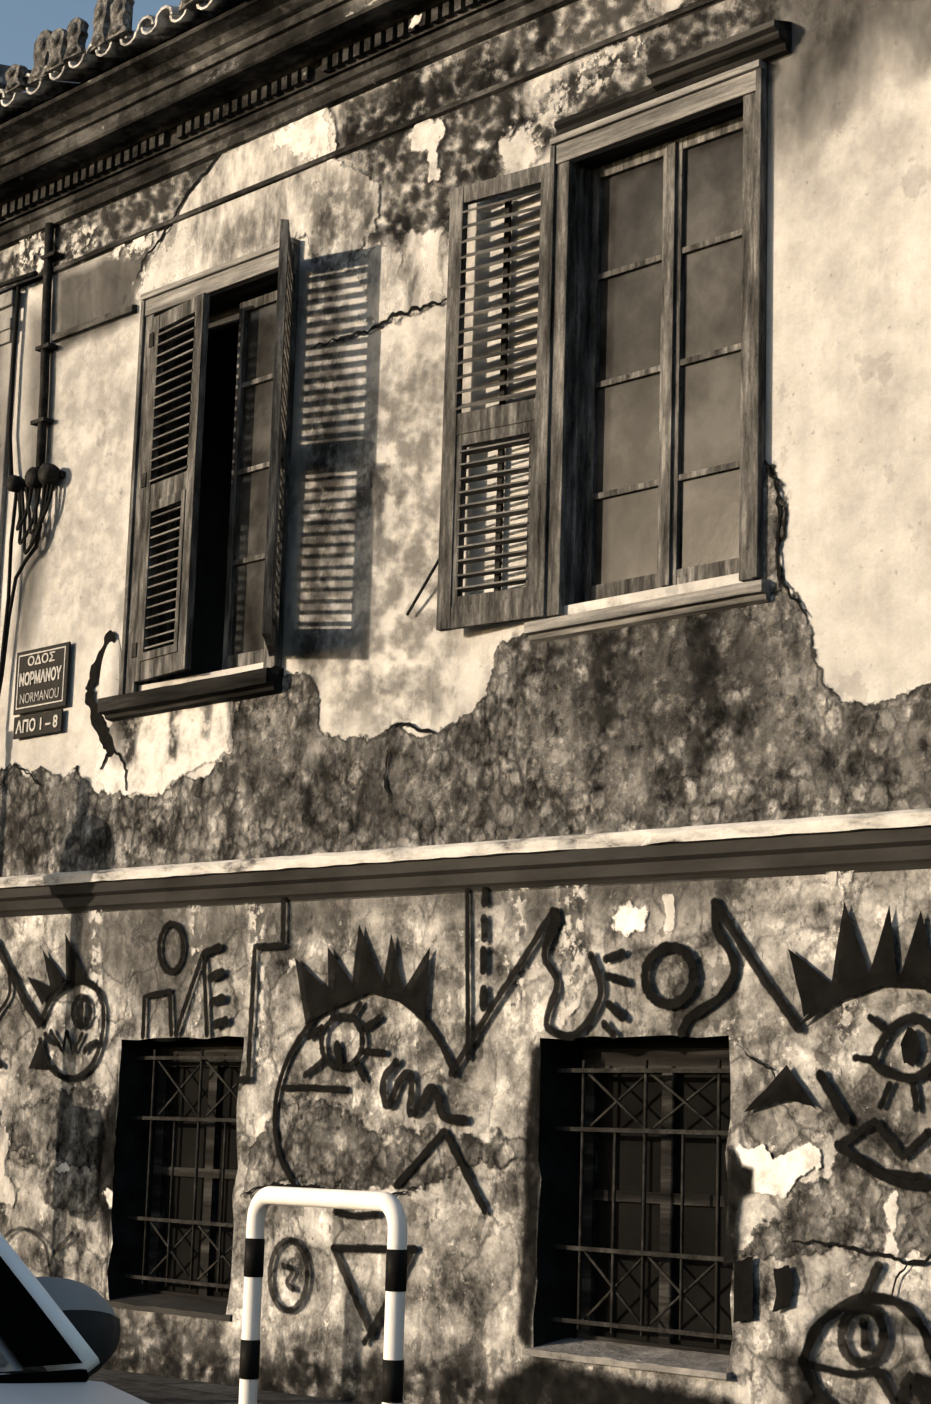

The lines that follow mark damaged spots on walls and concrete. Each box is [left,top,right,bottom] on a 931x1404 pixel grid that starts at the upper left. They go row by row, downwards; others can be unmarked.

damp [0,154,222,349]
crack [310,298,447,349]
damp [297,253,350,687]
damp [355,471,386,508]
spalling [0,461,931,877]
crack [241,1182,333,1195]
peeling [723,1142,931,1266]
crack [791,1239,931,1296]